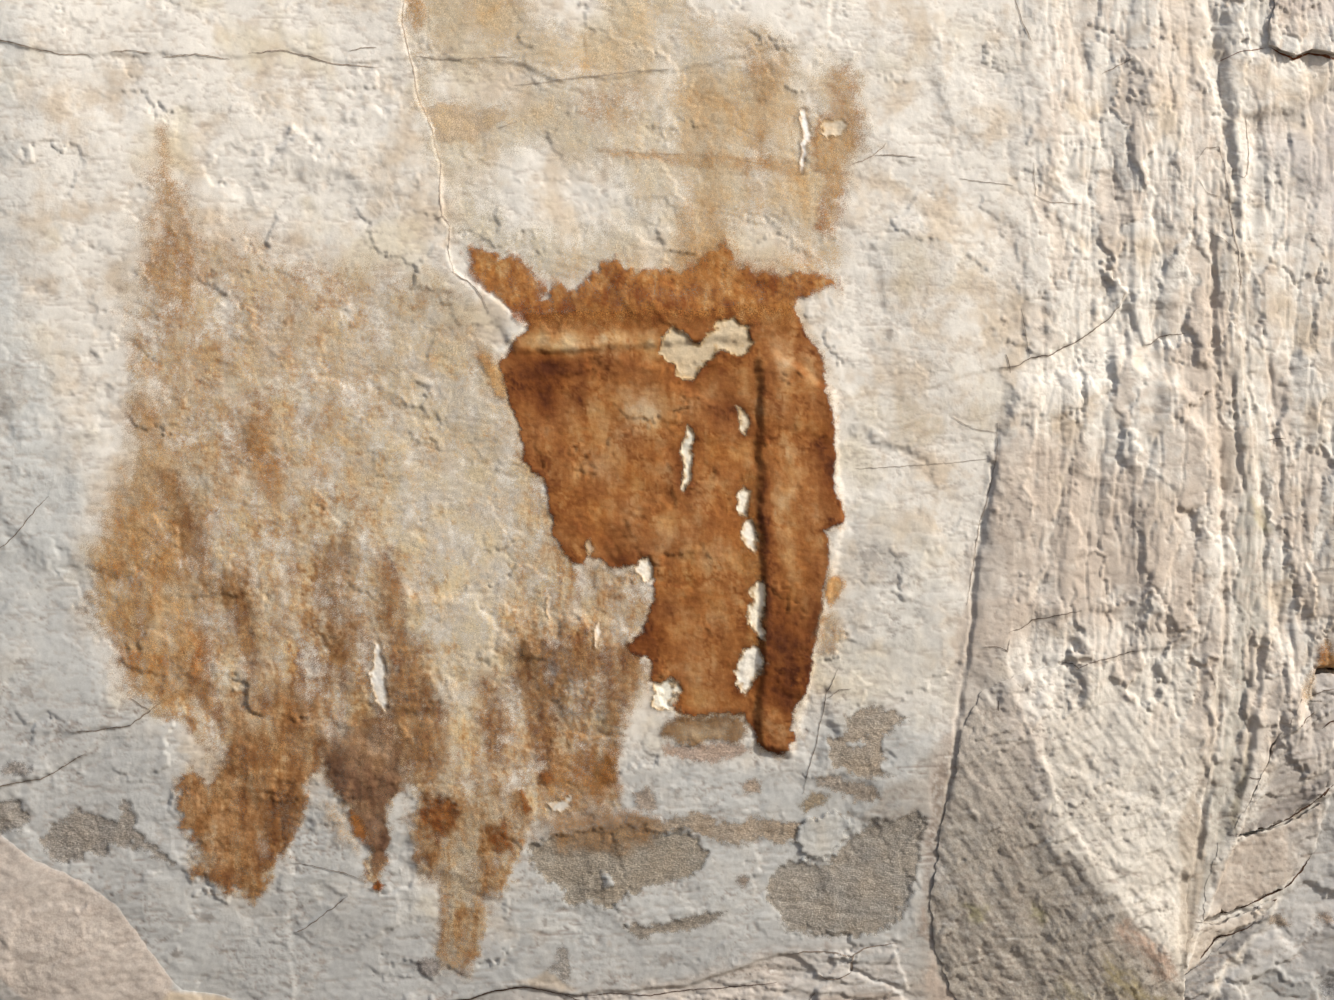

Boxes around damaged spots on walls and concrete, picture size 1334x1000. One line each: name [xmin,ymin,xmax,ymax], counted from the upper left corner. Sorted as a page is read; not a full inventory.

crack [1218,48,1334,62]
rust [86,0,866,974]
rust [1303,639,1334,699]
crack [1304,668,1334,729]
spalling [529,705,927,940]
crack [1233,785,1333,837]
crack [1200,854,1312,959]
crack [462,943,897,1000]